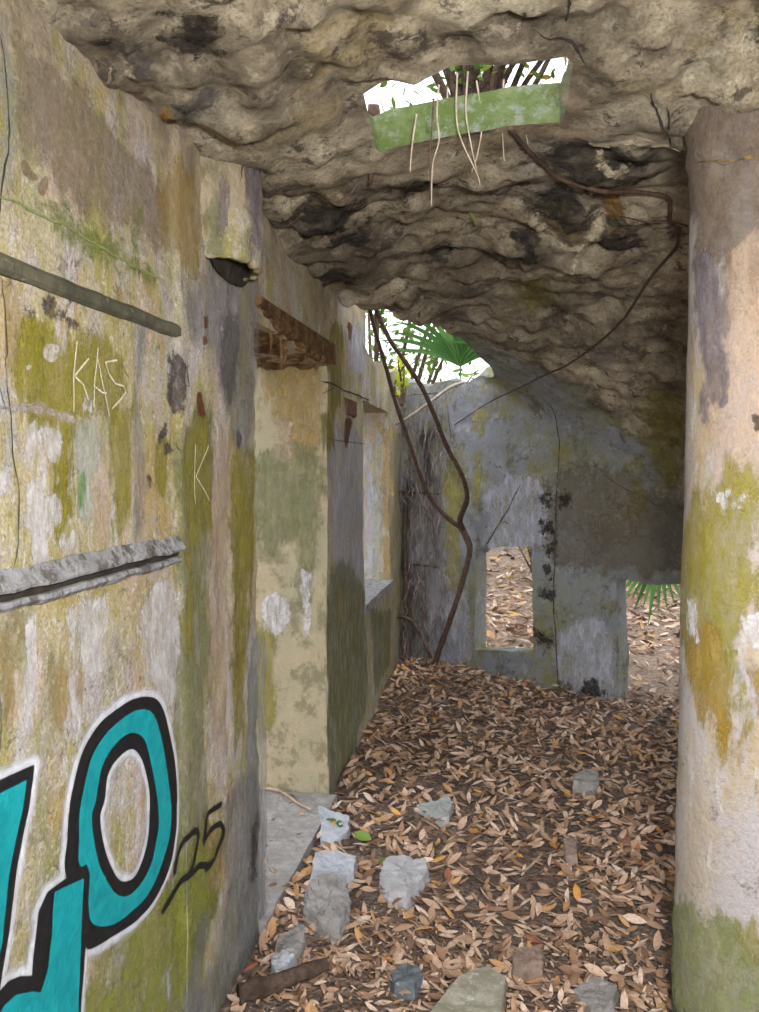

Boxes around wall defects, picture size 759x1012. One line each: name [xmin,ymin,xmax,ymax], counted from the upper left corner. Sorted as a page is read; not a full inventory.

water stain [555,53,589,121]
crack [0,32,163,282]
water stain [290,195,371,248]
water stain [382,180,442,205]
water stain [422,239,463,263]
water stain [511,106,759,495]
crack [0,278,20,572]
water stain [419,429,435,489]
water stain [181,275,415,747]
water stain [442,452,481,591]
water stain [703,640,747,741]
water stain [734,920,759,966]